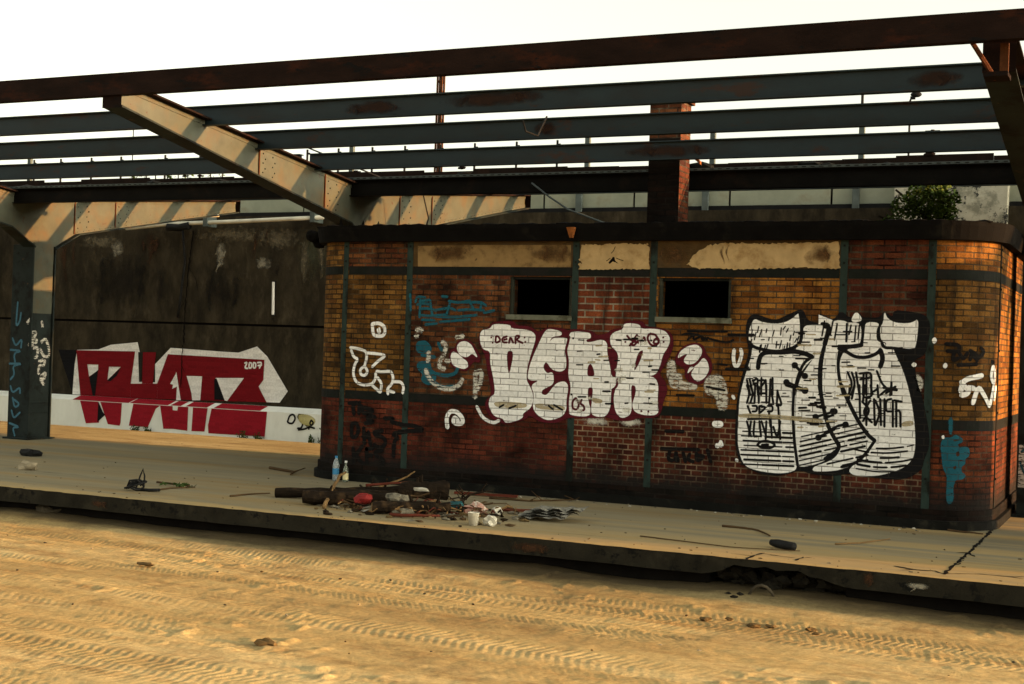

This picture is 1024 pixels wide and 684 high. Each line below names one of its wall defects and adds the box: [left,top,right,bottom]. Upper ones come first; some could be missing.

corrosion [459,92,538,106]
flaking render [578,243,650,270]
flaking render [687,241,840,270]
crack [896,530,1024,579]